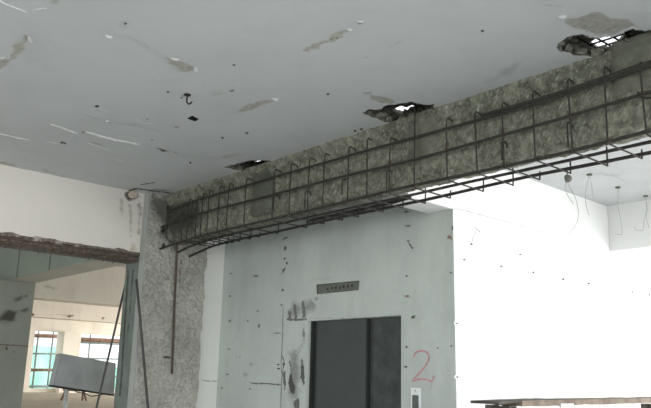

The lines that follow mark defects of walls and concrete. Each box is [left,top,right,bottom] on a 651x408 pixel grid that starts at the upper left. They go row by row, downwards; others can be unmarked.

peeling [557,8,651,57]
peeling [160,55,199,73]
spalling [358,90,434,122]
spalling [226,160,271,171]
leakage [116,193,144,253]
spalling [0,232,140,264]
spalling [164,244,178,374]
leakage [278,273,337,408]